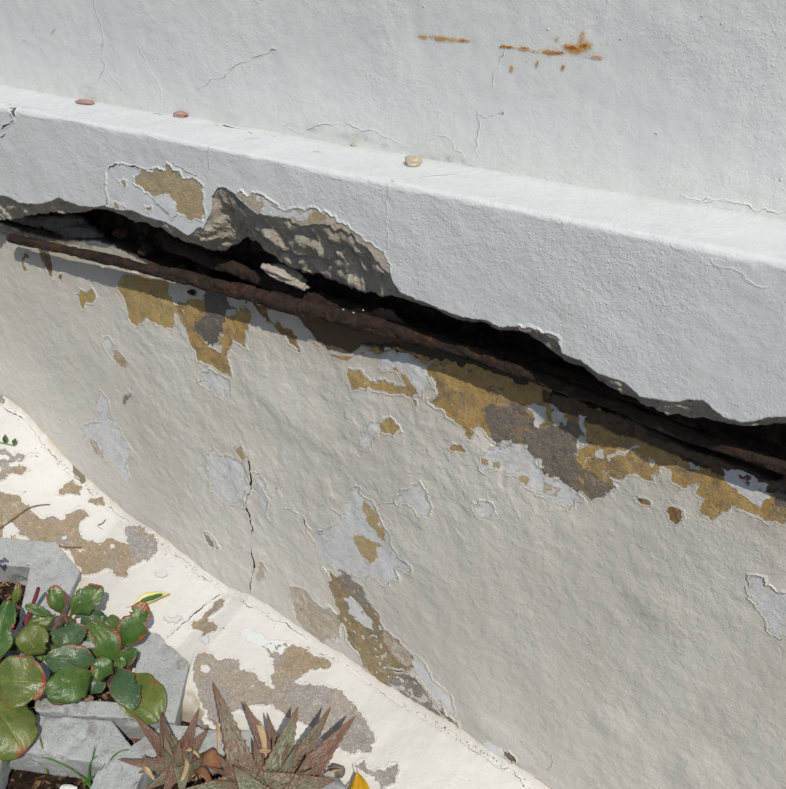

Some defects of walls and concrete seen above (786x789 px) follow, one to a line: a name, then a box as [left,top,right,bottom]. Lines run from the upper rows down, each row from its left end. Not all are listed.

crack [0,42,402,147]
corrosion [500,31,603,66]
crack [103,161,200,207]
spalling [0,160,786,446]
crack [0,403,149,536]
peeling [0,446,171,582]
peeling [82,388,134,484]
peeling [205,439,271,523]
crack [164,439,408,712]
spalling [287,483,462,729]
peeling [187,595,402,789]
crack [384,656,554,789]